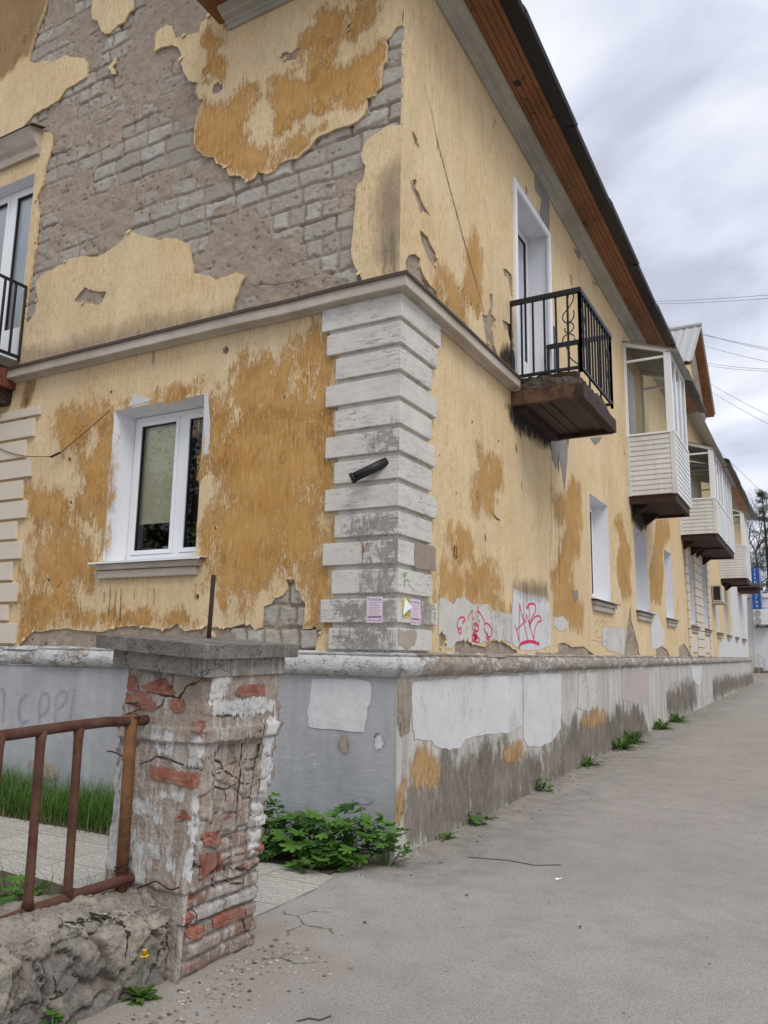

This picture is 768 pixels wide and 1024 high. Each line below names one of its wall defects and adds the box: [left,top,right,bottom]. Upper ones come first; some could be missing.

spalling [0,0,420,322]
peeling [405,226,515,352]
peeling [15,316,516,654]
peeling [550,476,592,655]
peeling [615,511,641,656]
crack [146,677,204,709]
water stain [666,676,697,717]
water stain [713,671,754,701]
flaking render [149,720,246,940]
crack [139,713,265,828]
water stain [398,701,648,846]
crack [58,912,131,960]